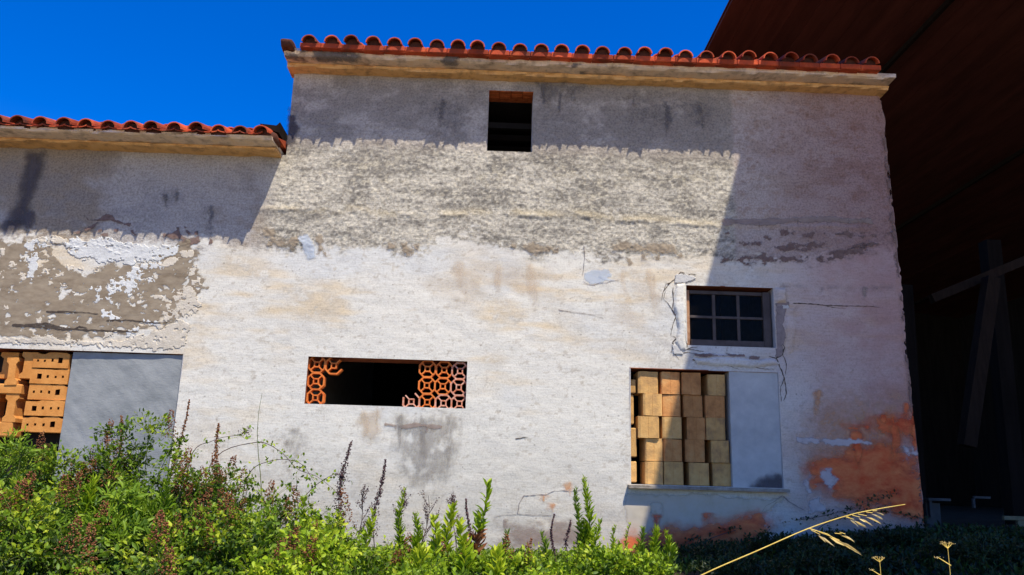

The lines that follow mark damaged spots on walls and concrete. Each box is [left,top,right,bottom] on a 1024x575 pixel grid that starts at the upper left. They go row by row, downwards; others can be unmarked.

peeling [720,212,900,277]
peeling [0,214,213,352]
crack [662,272,704,361]
crack [793,301,874,309]
crack [727,345,787,402]
water stain [384,423,442,431]
peeling [796,437,872,446]
rust [808,390,924,519]
crack [497,489,583,517]
peeling [804,468,838,514]
rust [622,513,768,552]